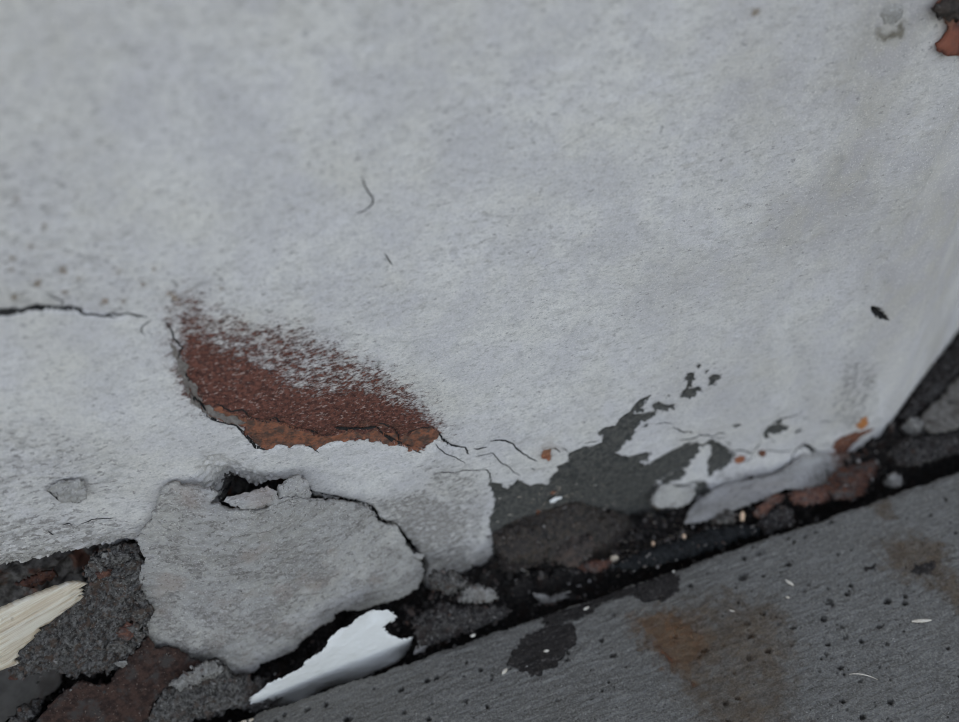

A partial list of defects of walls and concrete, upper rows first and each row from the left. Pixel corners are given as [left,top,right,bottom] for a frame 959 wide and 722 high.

corrosion [931,0,959,23]
spalling [871,306,889,321]
crack [0,293,597,479]
corrosion [163,291,445,452]
peeling [488,365,737,557]
peeling [764,418,801,442]
corrosion [832,416,874,453]
crack [310,490,426,574]
corrosion [753,482,833,535]